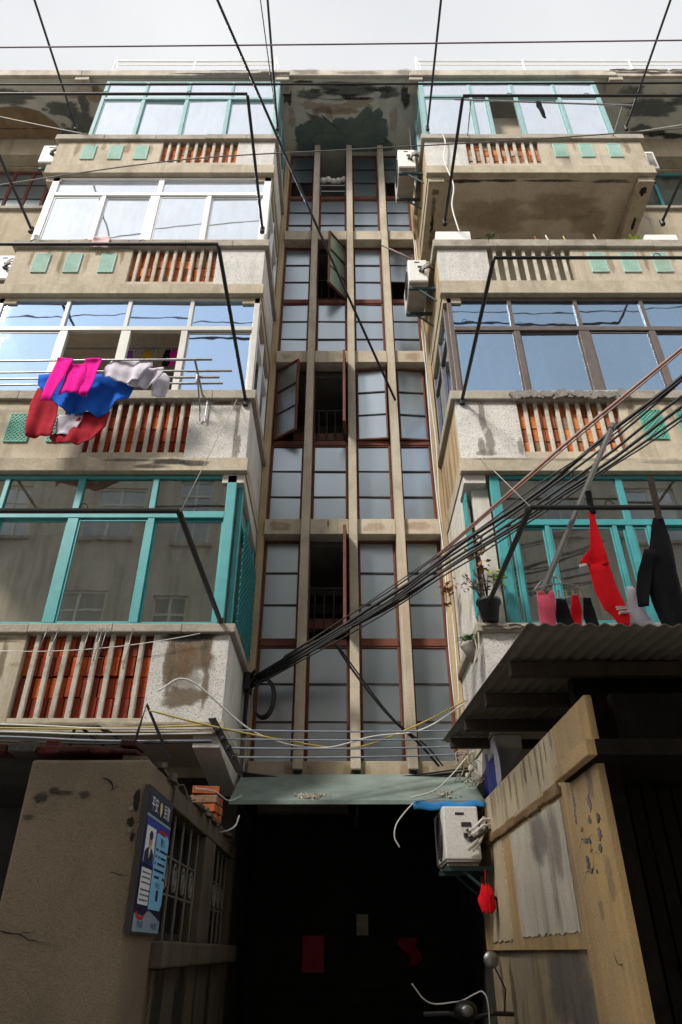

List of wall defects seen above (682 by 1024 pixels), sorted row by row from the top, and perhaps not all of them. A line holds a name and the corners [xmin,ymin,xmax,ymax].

water stain [47,96,93,134]
water stain [175,69,410,152]
water stain [619,86,682,139]
water stain [477,404,524,459]
water stain [162,633,217,707]
peeling [571,788,603,874]